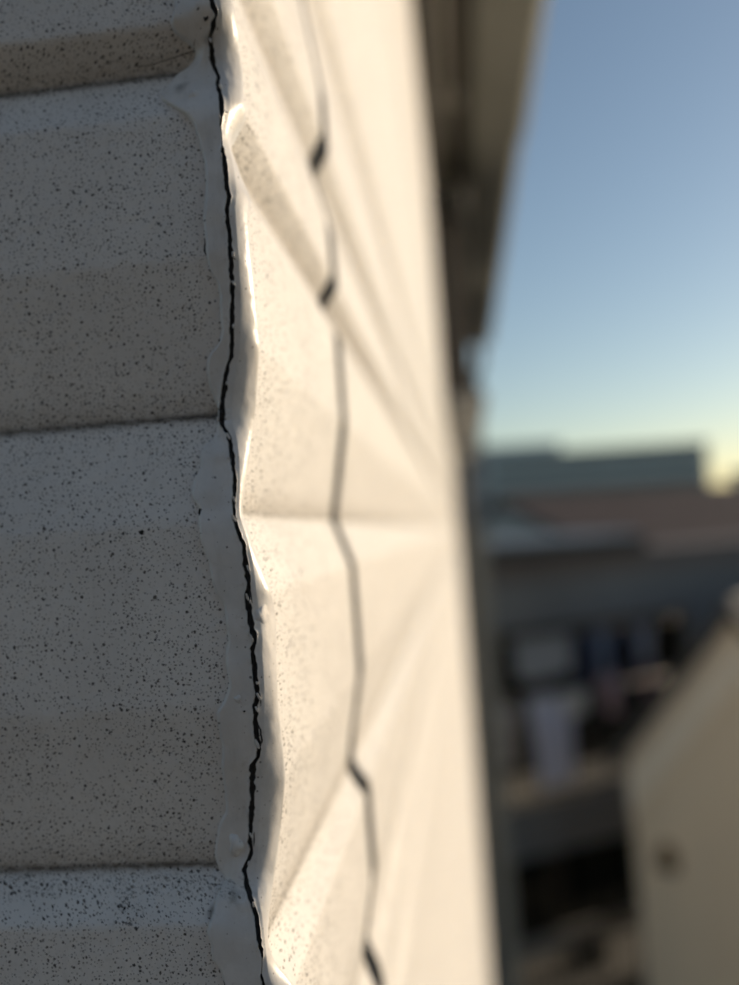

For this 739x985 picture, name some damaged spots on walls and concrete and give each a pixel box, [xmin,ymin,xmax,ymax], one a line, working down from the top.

crack [128,0,265,985]